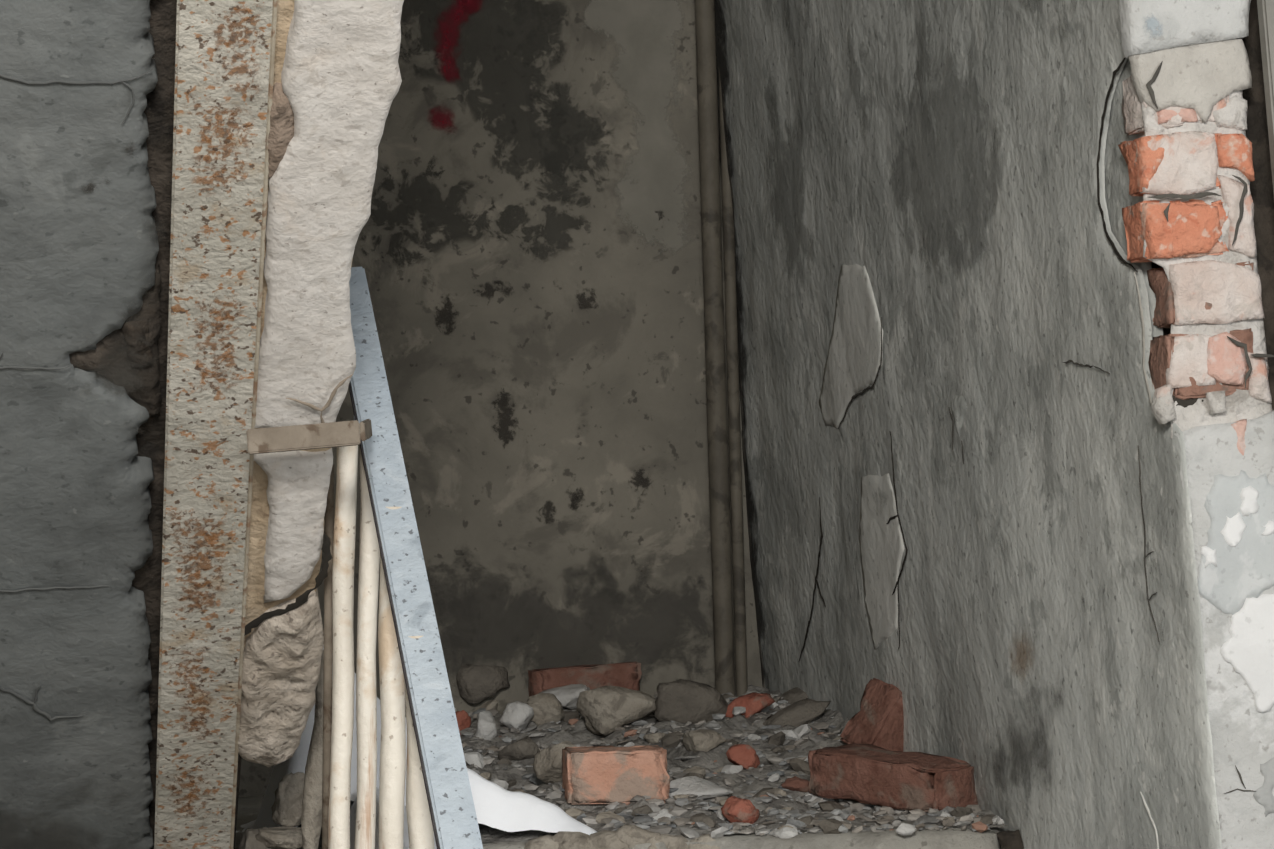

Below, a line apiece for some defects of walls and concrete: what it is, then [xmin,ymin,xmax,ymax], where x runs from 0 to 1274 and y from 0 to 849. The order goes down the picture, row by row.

rust [215,9,258,93]
rust [194,104,248,192]
flaking render [69,255,162,417]
rust [197,299,238,390]
peeling [819,264,883,429]
flaking render [1118,39,1274,713]
rust [172,512,224,612]
crack [886,432,908,649]
rust [175,650,210,738]
rust [171,772,207,818]
peeling [1253,758,1274,817]